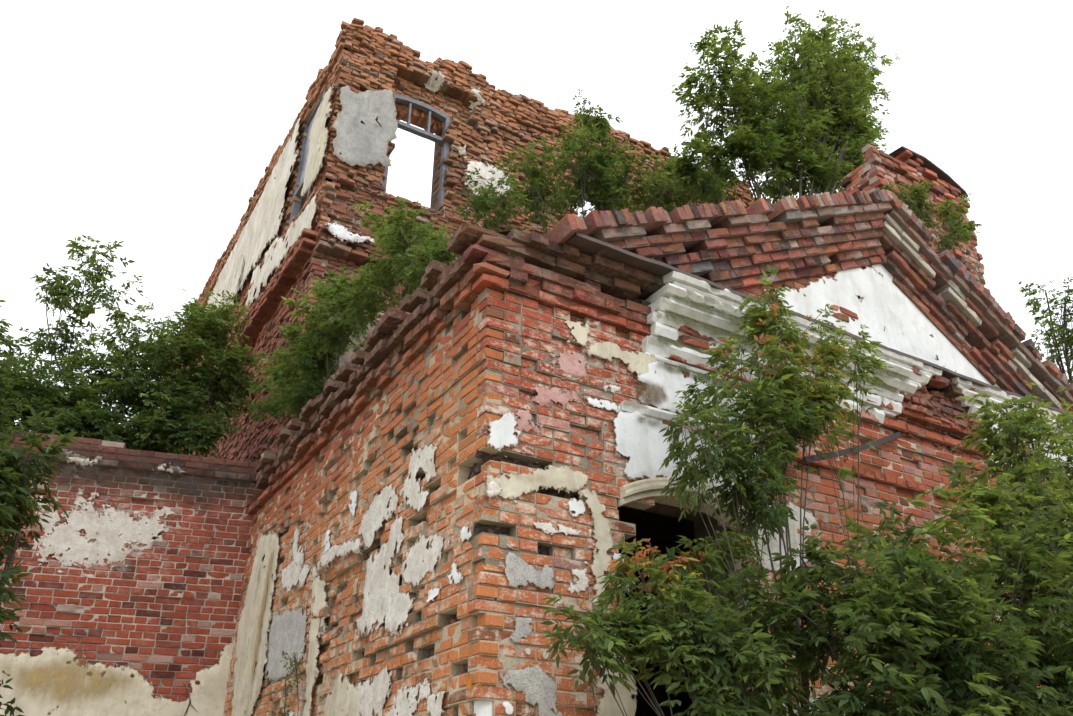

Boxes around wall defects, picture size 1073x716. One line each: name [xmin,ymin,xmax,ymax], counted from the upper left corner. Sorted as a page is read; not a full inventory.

flaking render [204,85,399,312]
flaking render [457,140,512,197]
flaking render [764,264,1000,460]
flaking render [0,320,817,716]